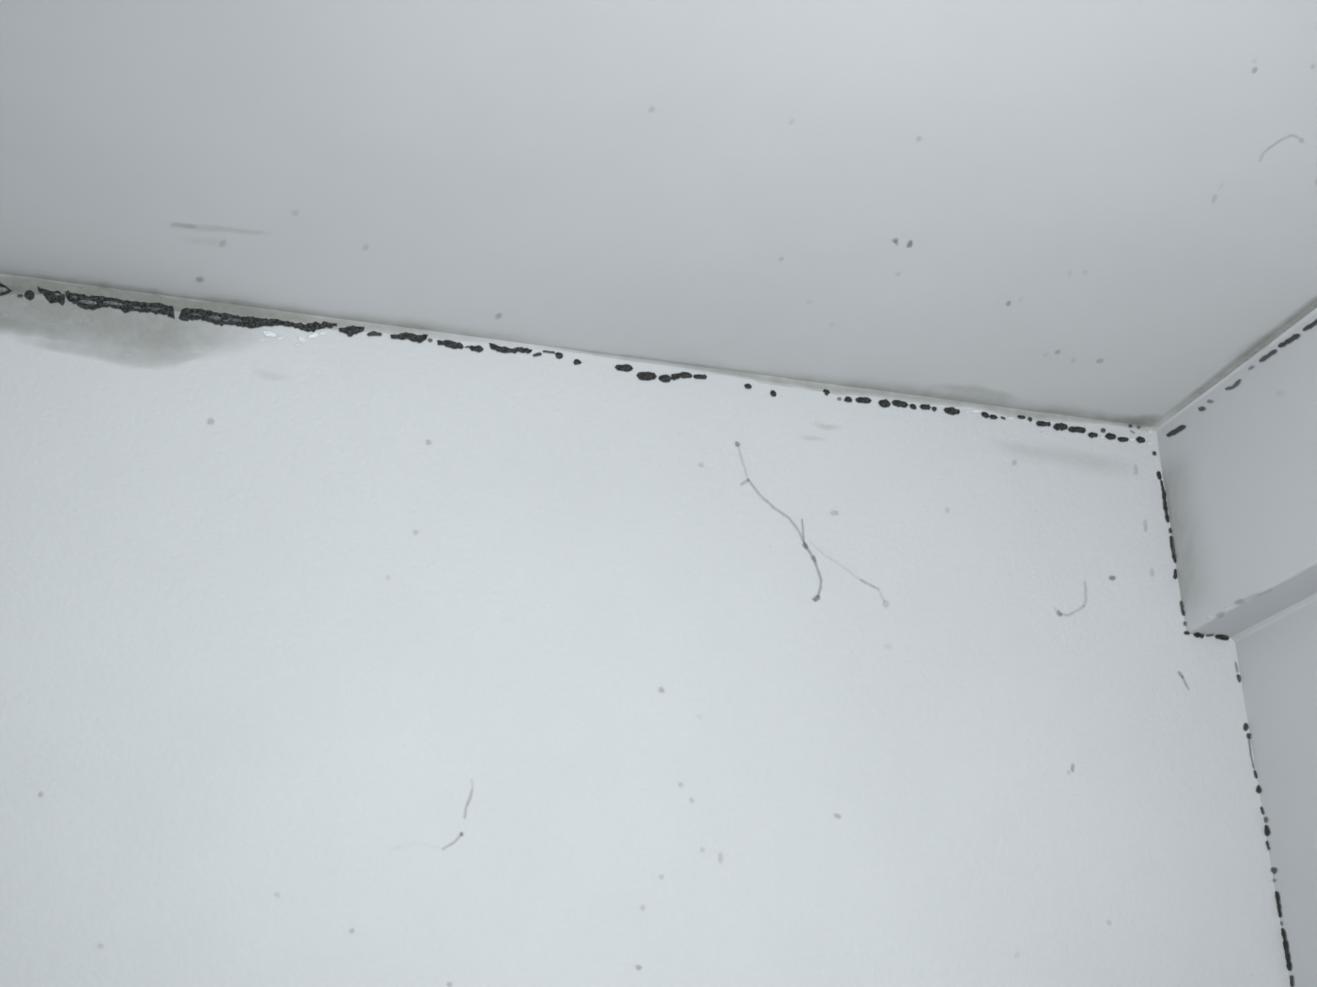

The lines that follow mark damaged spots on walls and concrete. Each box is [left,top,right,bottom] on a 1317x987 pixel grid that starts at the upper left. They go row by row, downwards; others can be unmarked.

water stain [3,281,223,329]